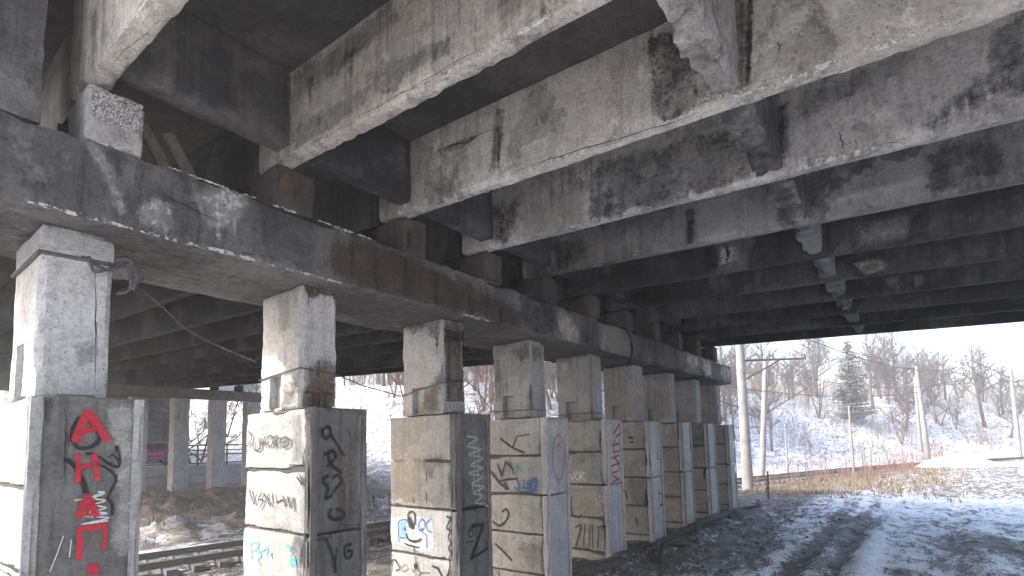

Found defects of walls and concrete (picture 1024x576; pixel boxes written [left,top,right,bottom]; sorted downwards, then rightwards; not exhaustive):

spalling [90,86,143,133]
crack [350,47,485,122]
water stain [491,109,503,164]
crack [513,112,699,172]
water stain [590,131,748,222]
water stain [643,32,698,120]
spalling [513,57,848,176]
water stain [926,141,1008,195]
corrosion [303,361,336,407]